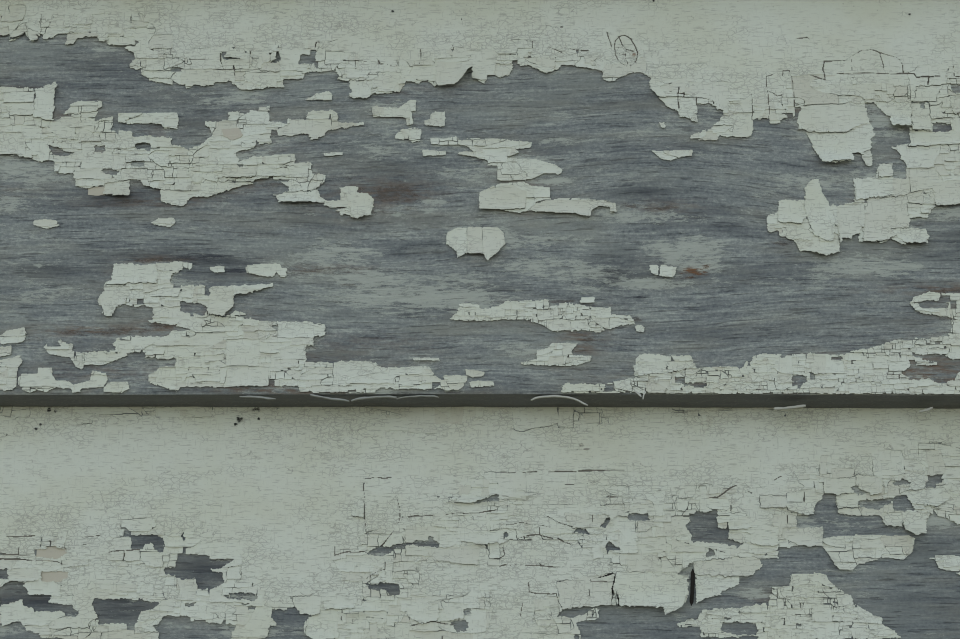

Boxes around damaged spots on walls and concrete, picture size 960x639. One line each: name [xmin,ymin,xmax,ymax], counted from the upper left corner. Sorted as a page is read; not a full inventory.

peeling [0,5,960,255]
peeling [446,227,505,260]
peeling [649,265,677,278]
peeling [0,261,494,393]
peeling [450,297,645,366]
peeling [561,291,960,395]
peeling [0,406,30,419]
peeling [74,407,212,424]
peeling [277,407,325,417]
peeling [365,406,647,434]
peeling [0,442,960,639]
crack [688,569,696,606]